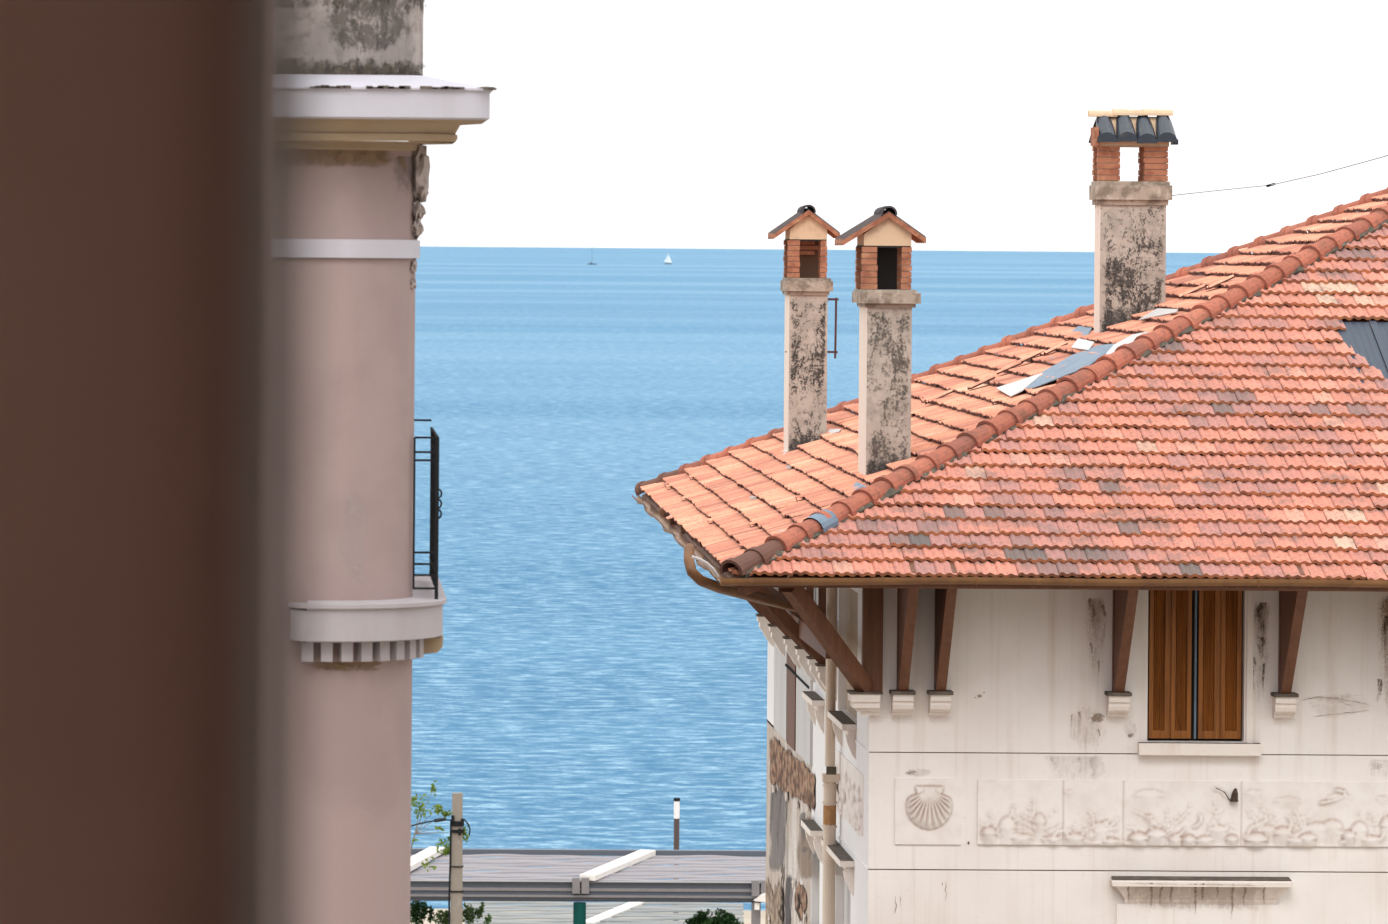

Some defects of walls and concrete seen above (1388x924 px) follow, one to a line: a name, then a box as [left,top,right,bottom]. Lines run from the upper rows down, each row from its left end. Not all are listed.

water stain [307,0,424,76]
water stain [1101,206,1164,332]
water stain [788,299,826,451]
water stain [866,312,910,475]
spalling [769,736,815,812]